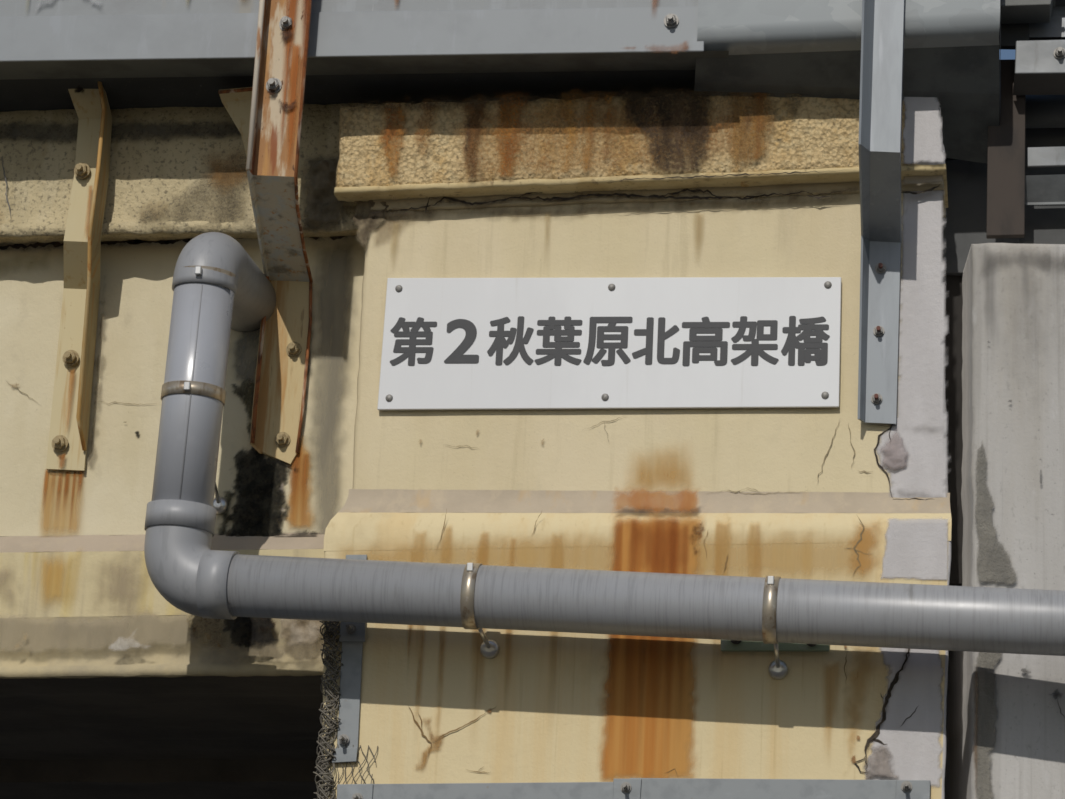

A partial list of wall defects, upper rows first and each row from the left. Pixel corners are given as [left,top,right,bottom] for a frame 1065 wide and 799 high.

rust [282,0,310,158]
crack [373,170,859,213]
crack [101,237,193,245]
peeling [876,97,948,498]
leakage [232,379,255,434]
rust [43,454,83,531]
leakage [219,447,296,537]
peeling [881,519,948,580]
leakage [223,617,279,651]
rust [601,634,695,780]
crack [854,649,917,773]
peeling [852,647,943,787]